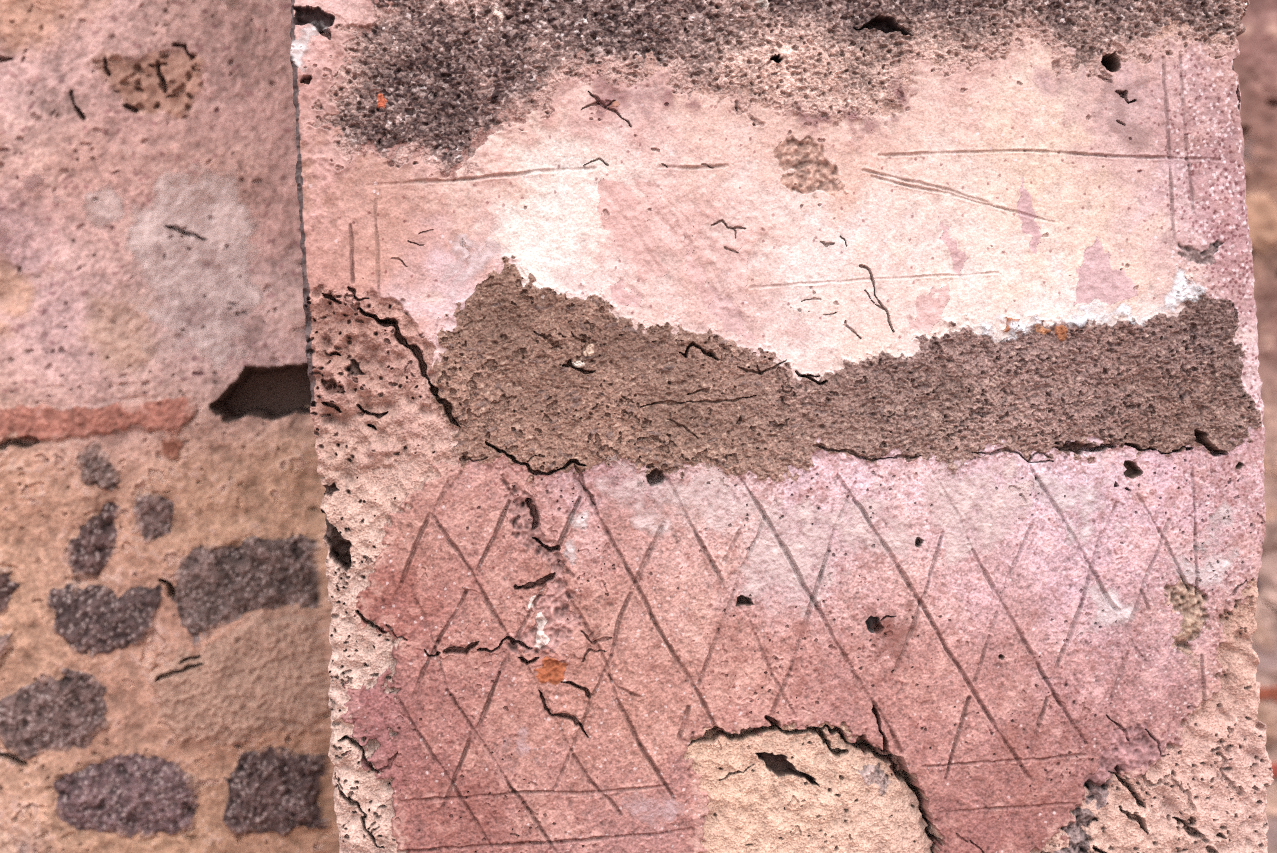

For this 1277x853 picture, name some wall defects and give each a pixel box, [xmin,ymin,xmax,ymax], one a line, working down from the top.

spalling [313,0,1250,198]
peeling [1074,236,1138,305]
spalling [1178,240,1222,265]
crack [322,286,459,428]
crack [537,333,596,374]
peeling [573,343,594,367]
crack [462,441,597,506]
spalling [305,286,459,853]
peeling [426,473,612,731]
spalling [685,721,945,853]
crack [691,705,983,853]
spalling [1029,575,1274,853]